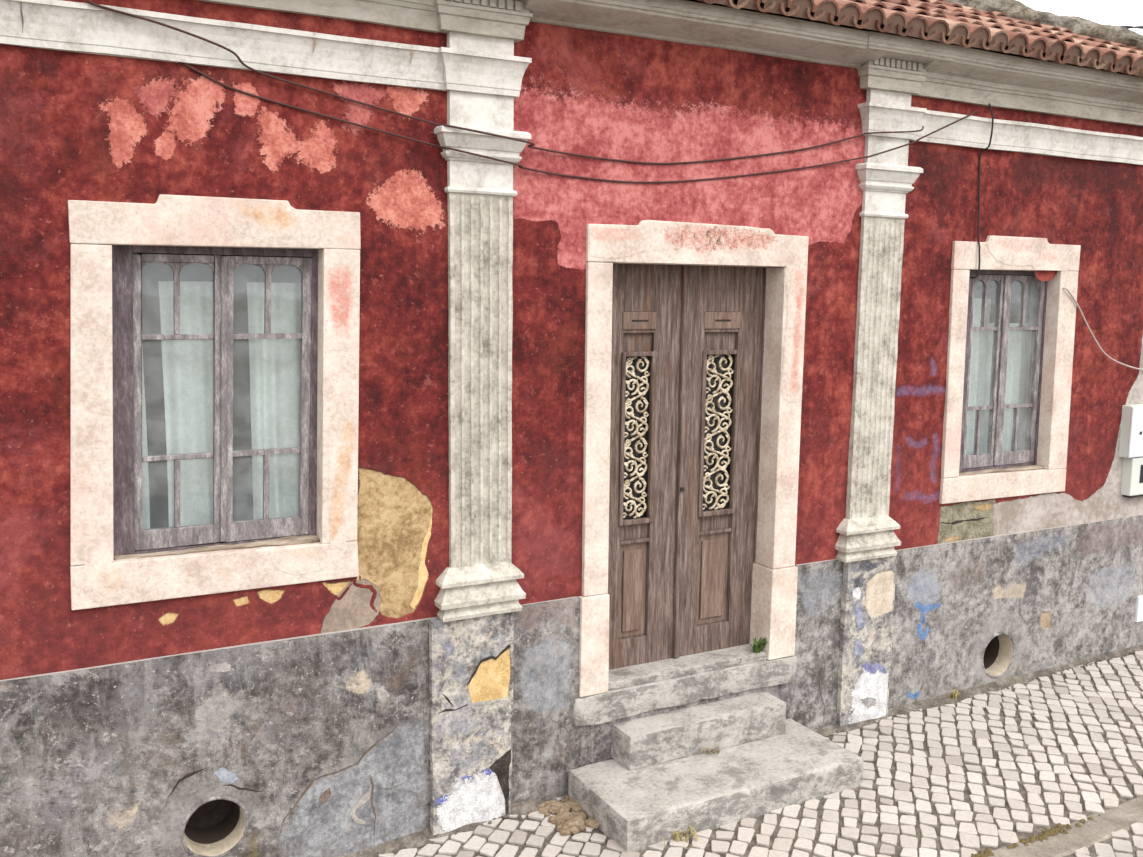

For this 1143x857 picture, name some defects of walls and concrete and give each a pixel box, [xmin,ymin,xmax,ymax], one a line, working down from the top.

peeling [97,70,430,174]
peeling [365,165,448,236]
peeling [146,601,190,637]
peeling [220,584,296,617]
spalling [312,457,443,634]
peeling [796,561,896,724]
peeling [937,499,1076,637]
crack [161,767,263,811]
crack [279,723,403,837]
peeling [256,636,581,857]